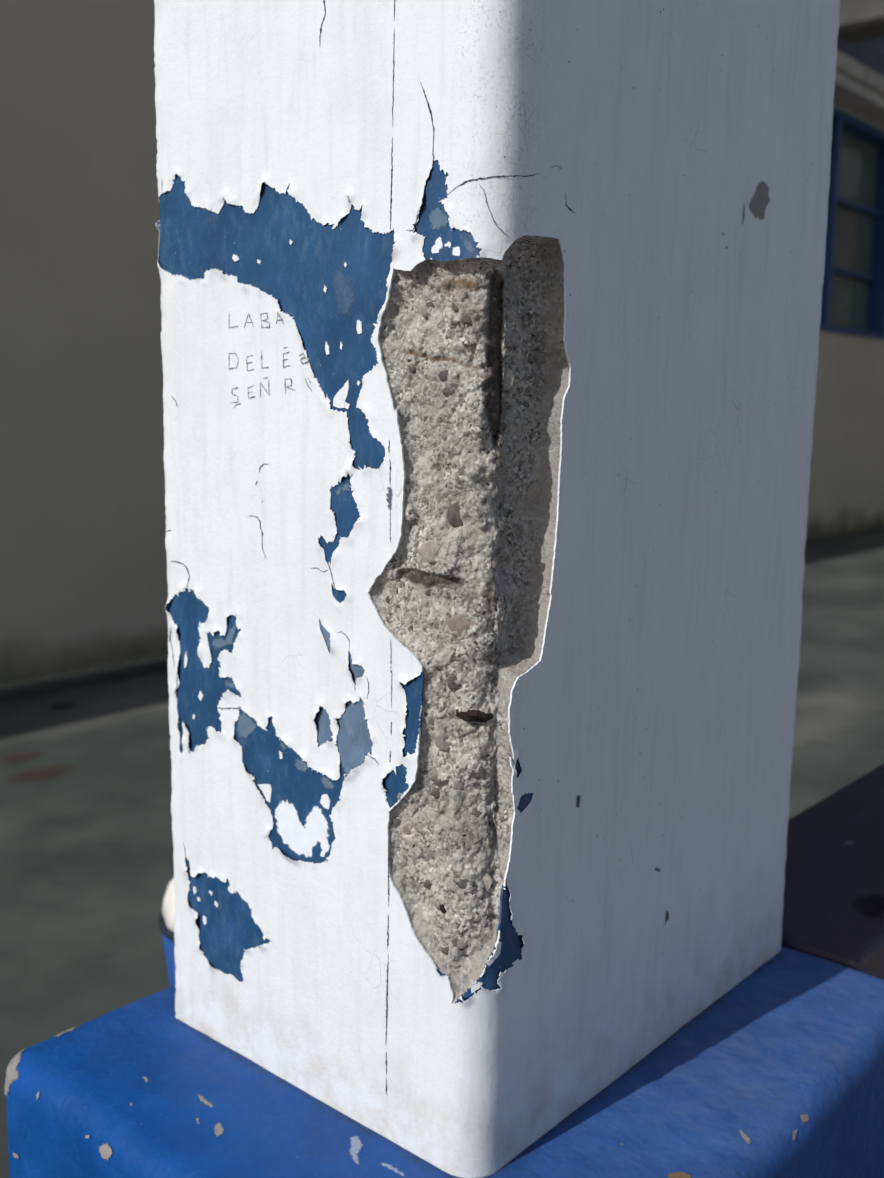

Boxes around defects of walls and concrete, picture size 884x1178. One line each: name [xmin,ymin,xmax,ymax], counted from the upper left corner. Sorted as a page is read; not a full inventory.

crack [390,0,435,231]
crack [451,165,562,238]
crack [385,442,393,540]
spalling [159,157,569,1003]
crack [354,639,392,765]
crack [383,838,391,1094]
peeling [4,1048,26,1095]
peeling [85,1135,112,1160]